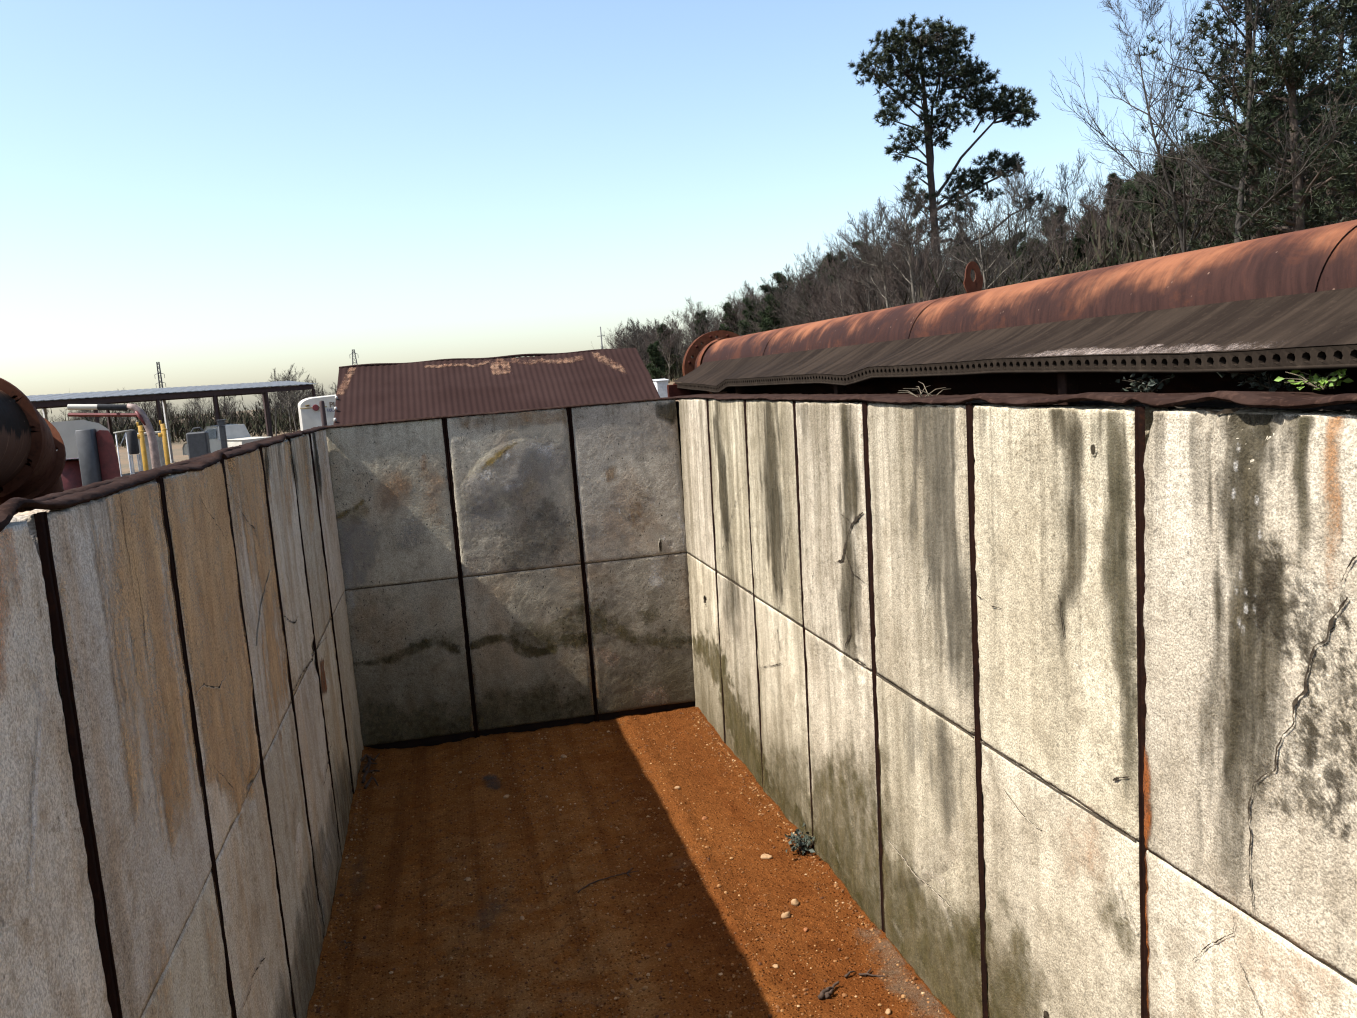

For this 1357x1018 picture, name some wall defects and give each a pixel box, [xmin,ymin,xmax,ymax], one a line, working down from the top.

corrosion [108,437,329,840]
water stain [760,401,785,599]
crack [760,510,863,668]
water stain [838,404,859,654]
water stain [912,406,972,677]
water stain [1050,409,1084,631]
water stain [1101,411,1136,774]
water stain [1206,413,1357,838]
corrosion [1143,750,1151,961]
crack [1192,555,1357,1018]
spalling [1041,1001,1056,1018]